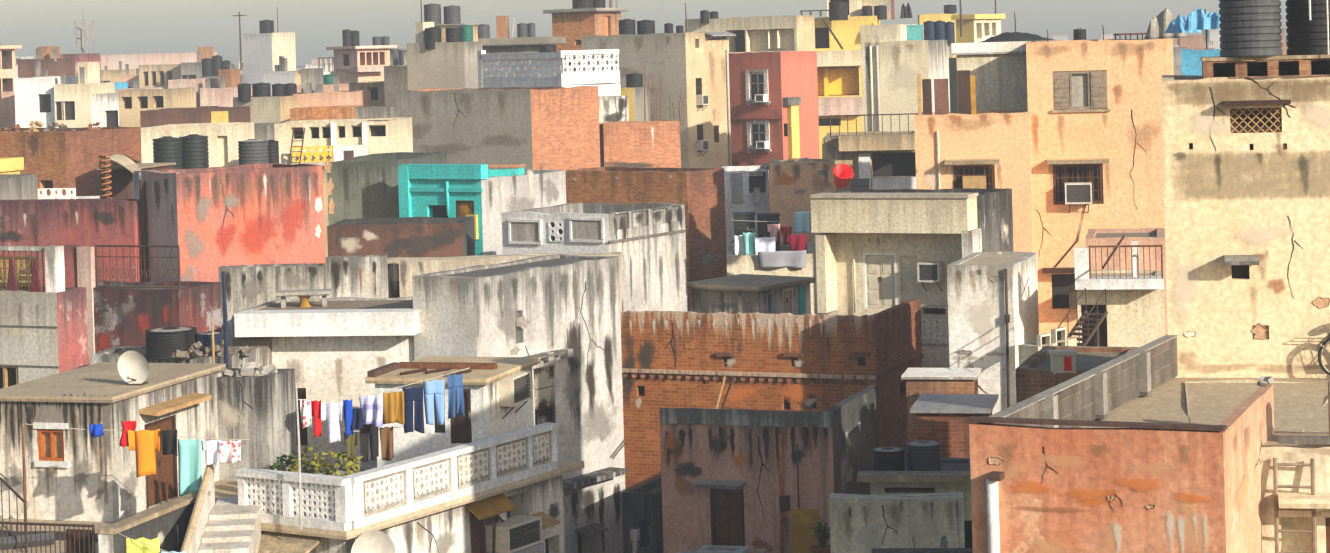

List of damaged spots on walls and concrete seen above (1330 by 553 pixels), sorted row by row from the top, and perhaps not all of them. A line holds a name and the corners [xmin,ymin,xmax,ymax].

leakage [0,213,37,243]
leakage [186,174,290,203]
leakage [614,208,683,292]
crack [1129,110,1146,208]
crack [1209,87,1226,151]
crack [1245,77,1296,118]
crack [1287,217,1303,298]
leakage [485,273,829,419]
spalling [1251,323,1267,340]
spalling [1312,296,1330,308]
crack [756,437,771,521]
leakage [665,405,873,493]